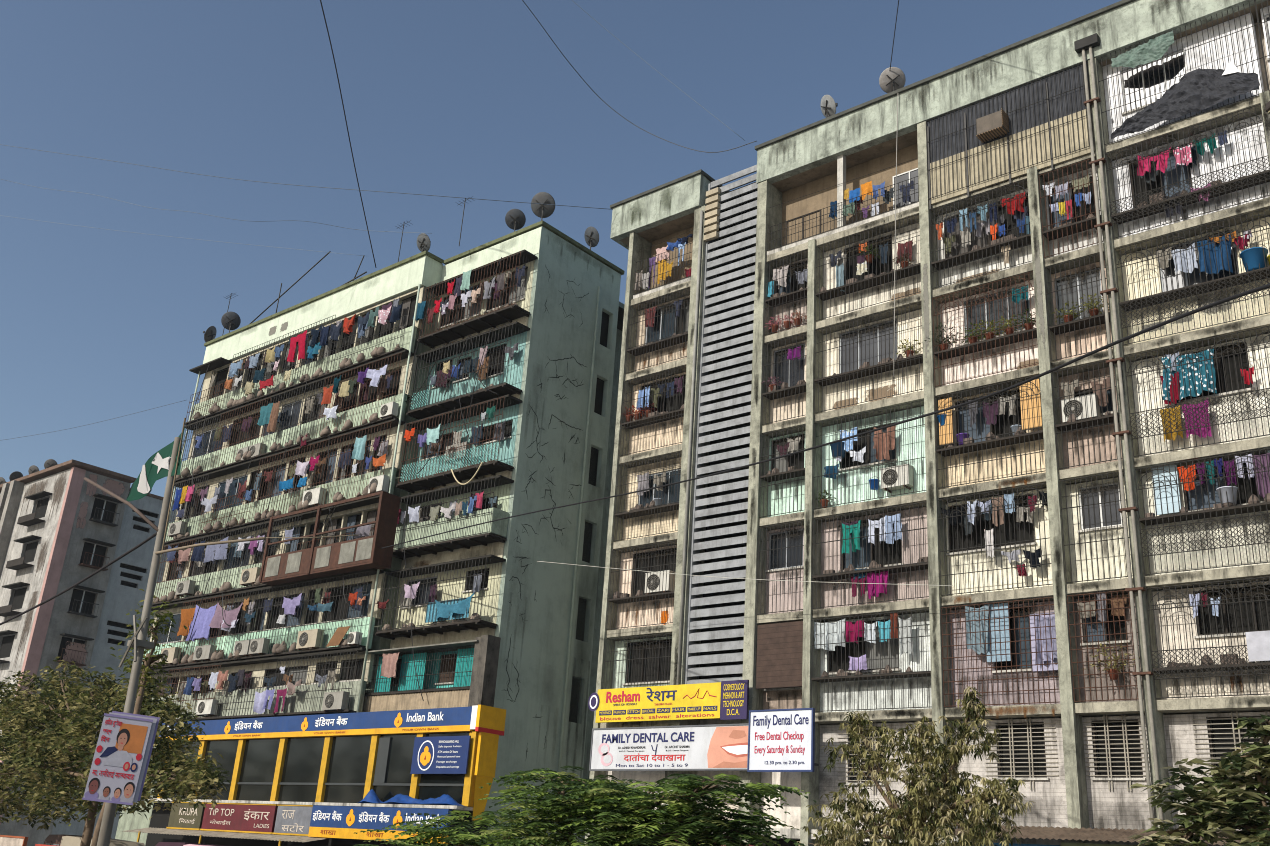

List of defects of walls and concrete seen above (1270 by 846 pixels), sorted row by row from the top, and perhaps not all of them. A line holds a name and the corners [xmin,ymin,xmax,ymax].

crack [545,265,589,325]
crack [504,354,586,757]